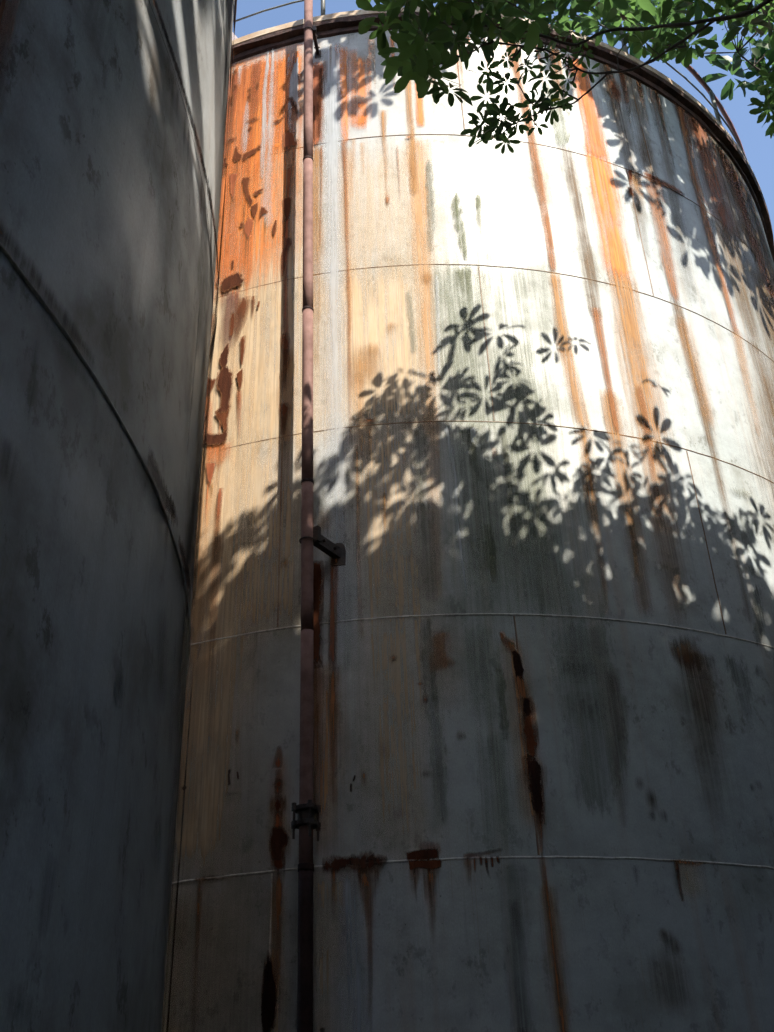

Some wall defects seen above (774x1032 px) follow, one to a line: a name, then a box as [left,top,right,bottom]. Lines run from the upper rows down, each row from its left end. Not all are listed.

corrosion [153,0,366,1032]
corrosion [500,40,596,527]
corrosion [550,49,774,593]
corrosion [322,852,387,956]
corrosion [407,845,441,906]
corrosion [541,858,566,1032]